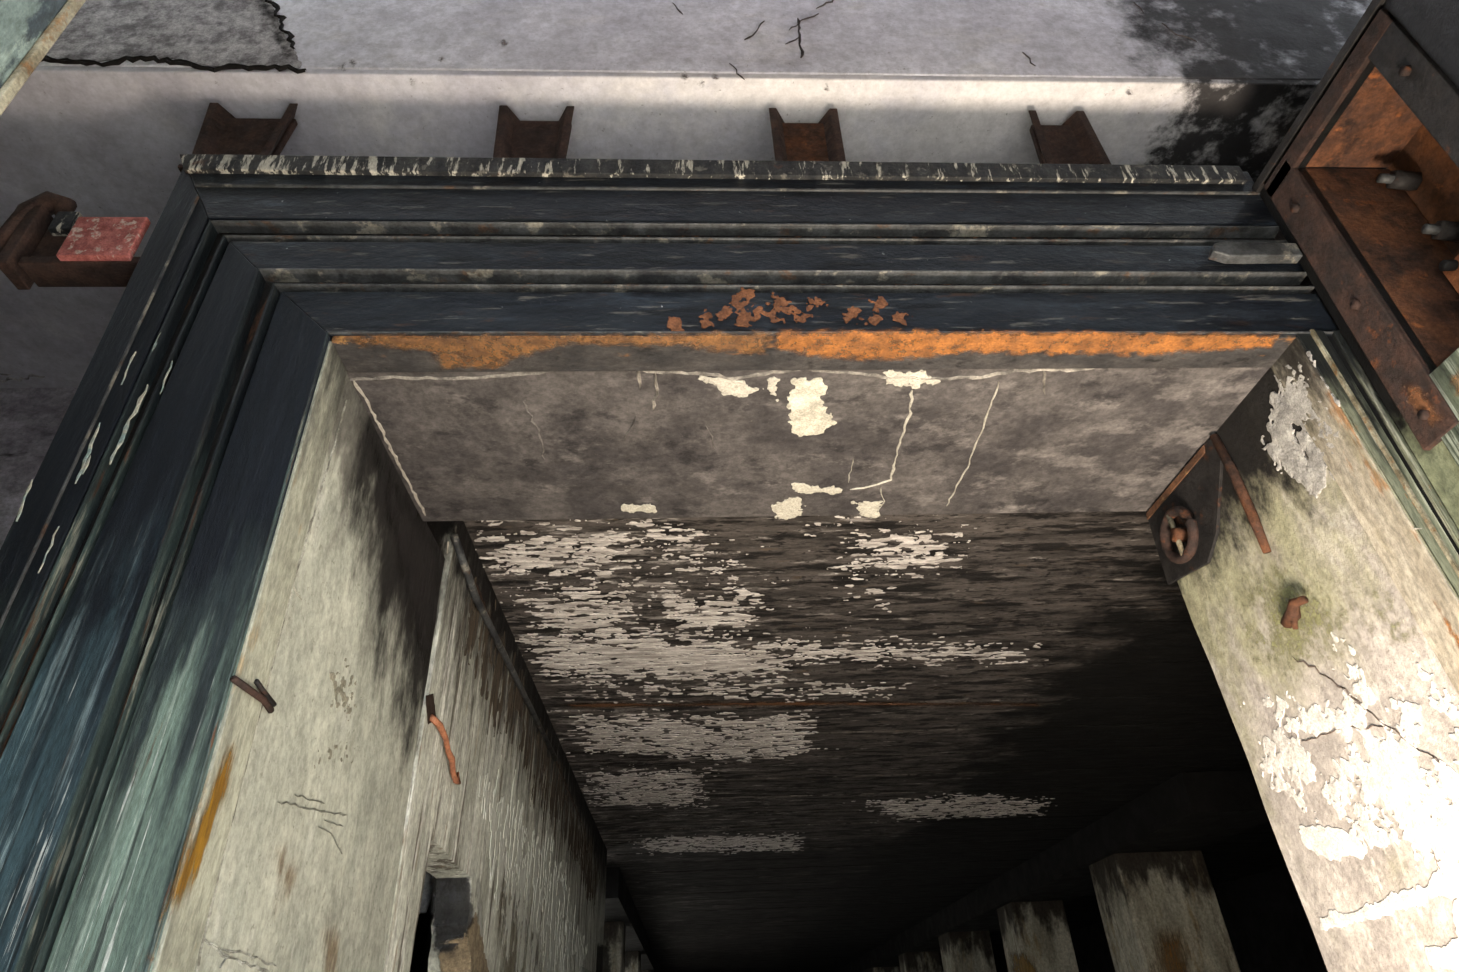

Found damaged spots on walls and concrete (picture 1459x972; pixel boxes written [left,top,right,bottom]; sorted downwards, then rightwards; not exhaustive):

spalling [46,0,302,69]
crack [729,0,834,80]
rust [359,287,1276,369]
peeling [698,376,837,437]
peeling [883,369,941,389]
peeling [1260,351,1340,498]
peeling [462,482,1055,972]
peeling [1240,631,1459,972]
spalling [438,912,489,972]